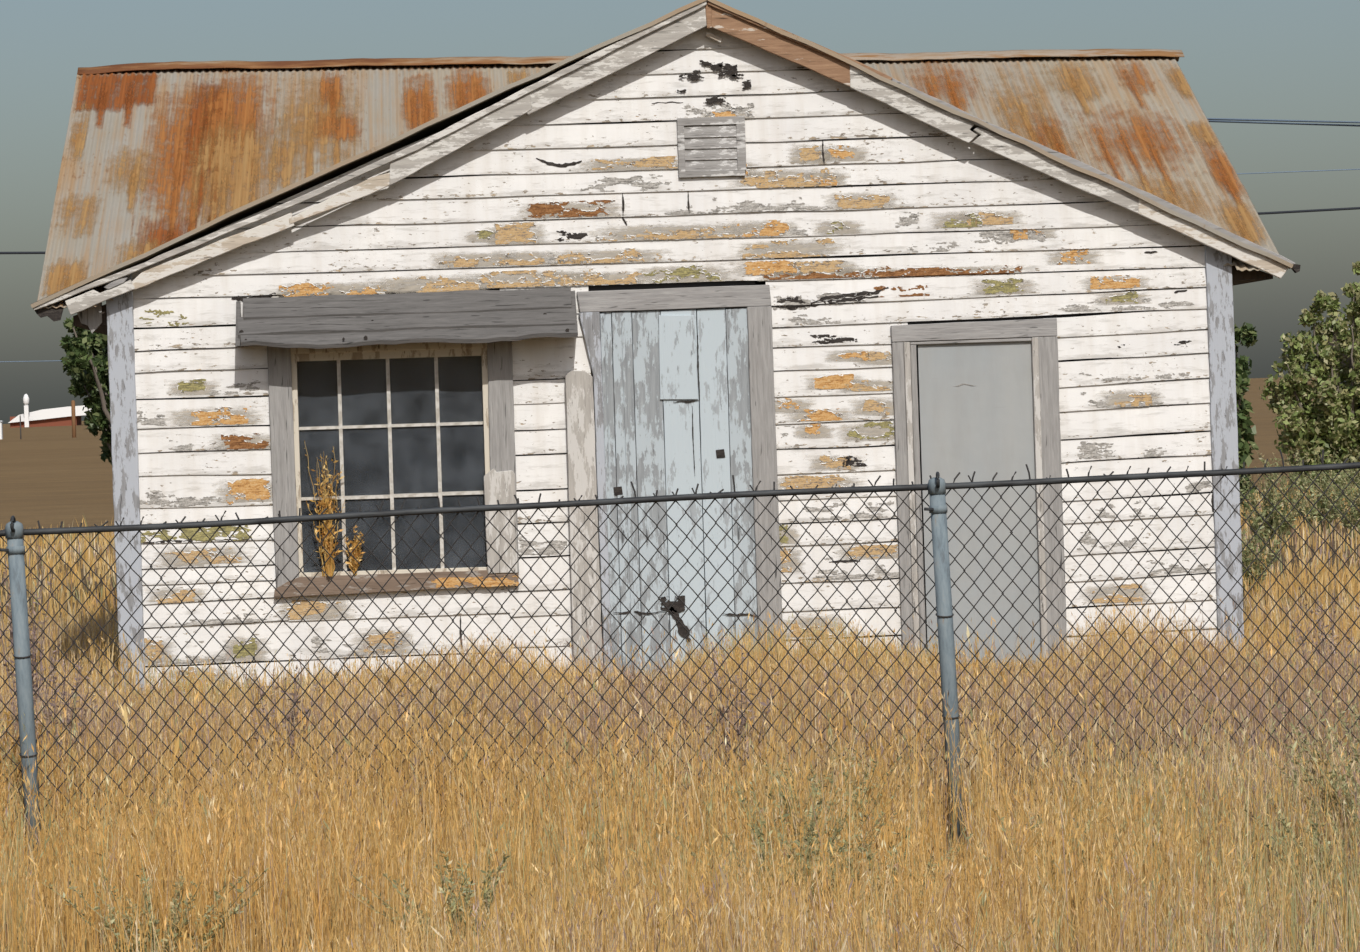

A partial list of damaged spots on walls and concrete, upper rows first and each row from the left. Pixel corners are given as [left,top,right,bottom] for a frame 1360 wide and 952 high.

rust [404,69,487,129]
peeling [677,60,755,120]
rust [913,65,975,110]
rust [997,79,1074,156]
rust [71,71,361,262]
rust [1056,63,1265,244]
rust [43,261,85,303]
peeling [278,144,1194,520]
peeling [137,378,271,451]
peeling [140,478,273,507]
peeling [431,575,519,589]
peeling [1089,553,1211,604]